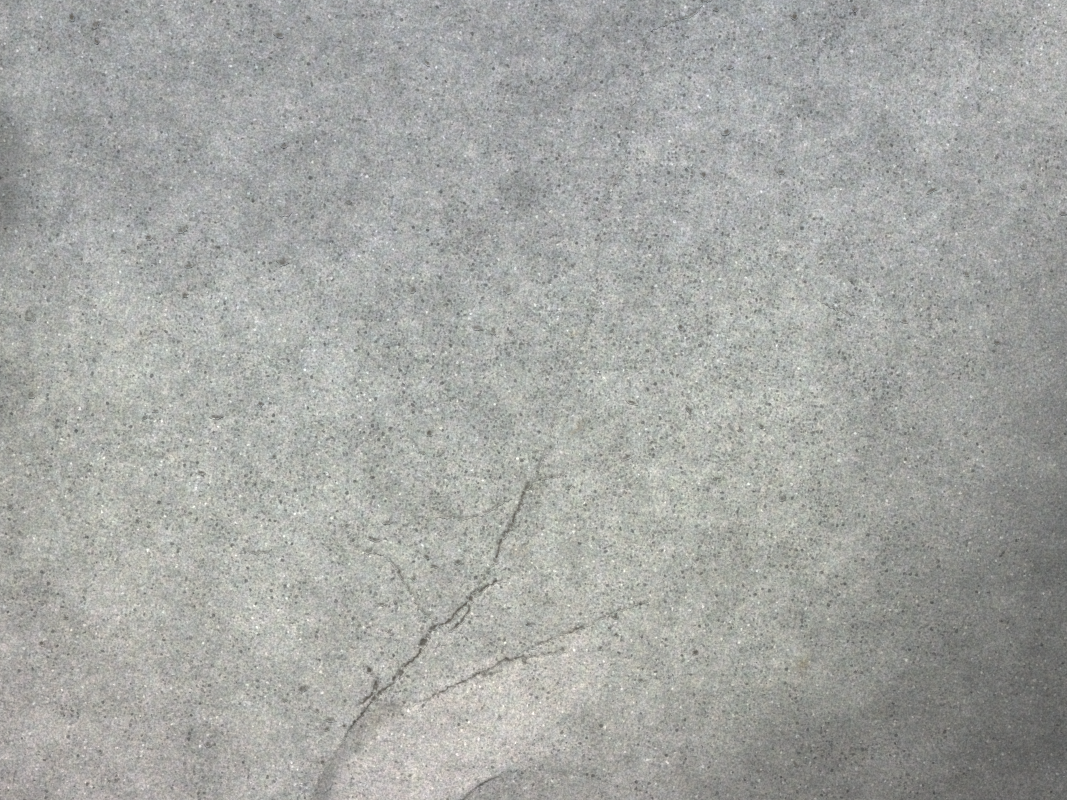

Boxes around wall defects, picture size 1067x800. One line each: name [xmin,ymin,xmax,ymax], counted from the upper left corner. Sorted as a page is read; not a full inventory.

crack [342,0,712,740]
crack [461,775,503,800]